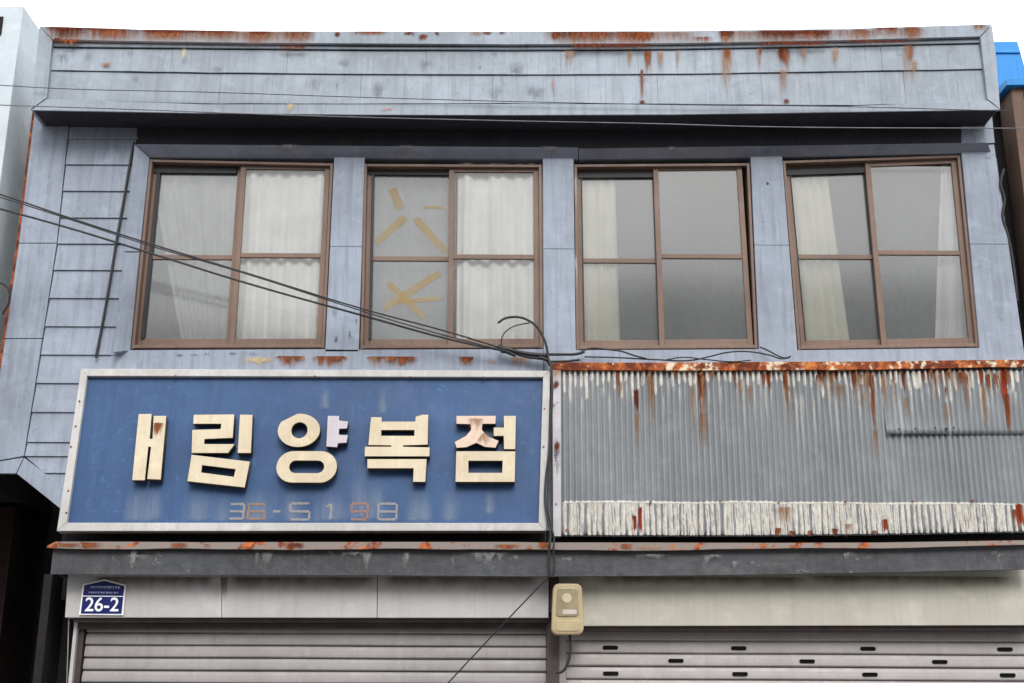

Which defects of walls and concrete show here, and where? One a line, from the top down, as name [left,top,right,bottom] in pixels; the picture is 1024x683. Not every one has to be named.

corrosion [49,26,310,49]
corrosion [552,31,708,104]
corrosion [721,27,918,82]
corrosion [276,356,348,365]
corrosion [367,356,417,364]
corrosion [634,371,653,434]
corrosion [693,370,714,433]
corrosion [734,370,790,401]
corrosion [816,370,908,447]
corrosion [921,369,1010,427]
corrosion [632,507,642,531]
corrosion [1012,504,1024,528]